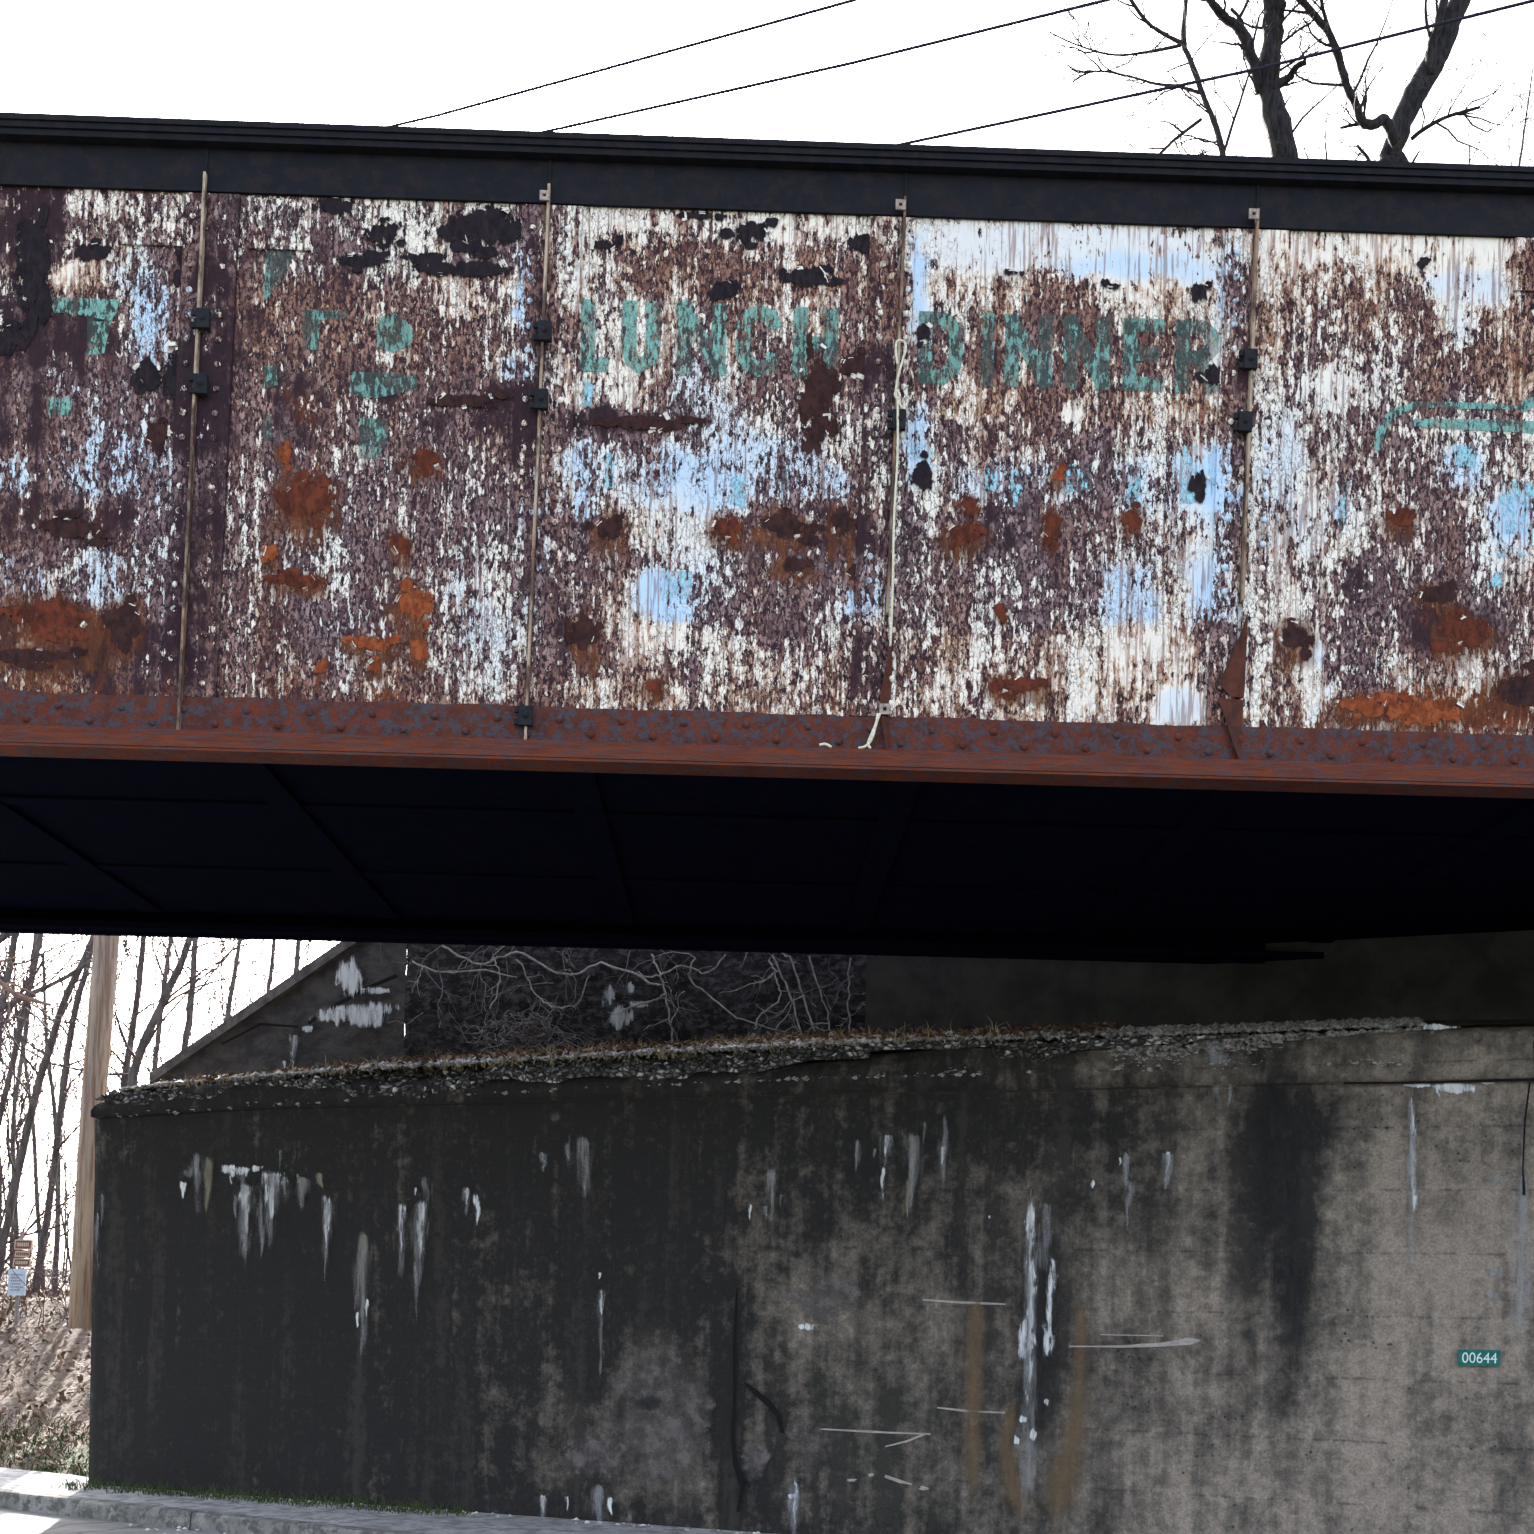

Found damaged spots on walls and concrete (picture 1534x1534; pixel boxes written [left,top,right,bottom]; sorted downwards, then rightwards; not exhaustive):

peeling [327,204,522,278]
peeling [676,211,778,250]
peeling [797,333,865,457]
peeling [908,450,938,491]
corrosion [260,439,338,599]
corrosion [708,505,858,589]
corrosion [0,593,144,684]
corrosion [339,532,435,684]
water stain [282,957,399,1068]
water stain [204,1158,330,1248]
water stain [399,1188,425,1254]
water stain [1014,1202,1056,1444]